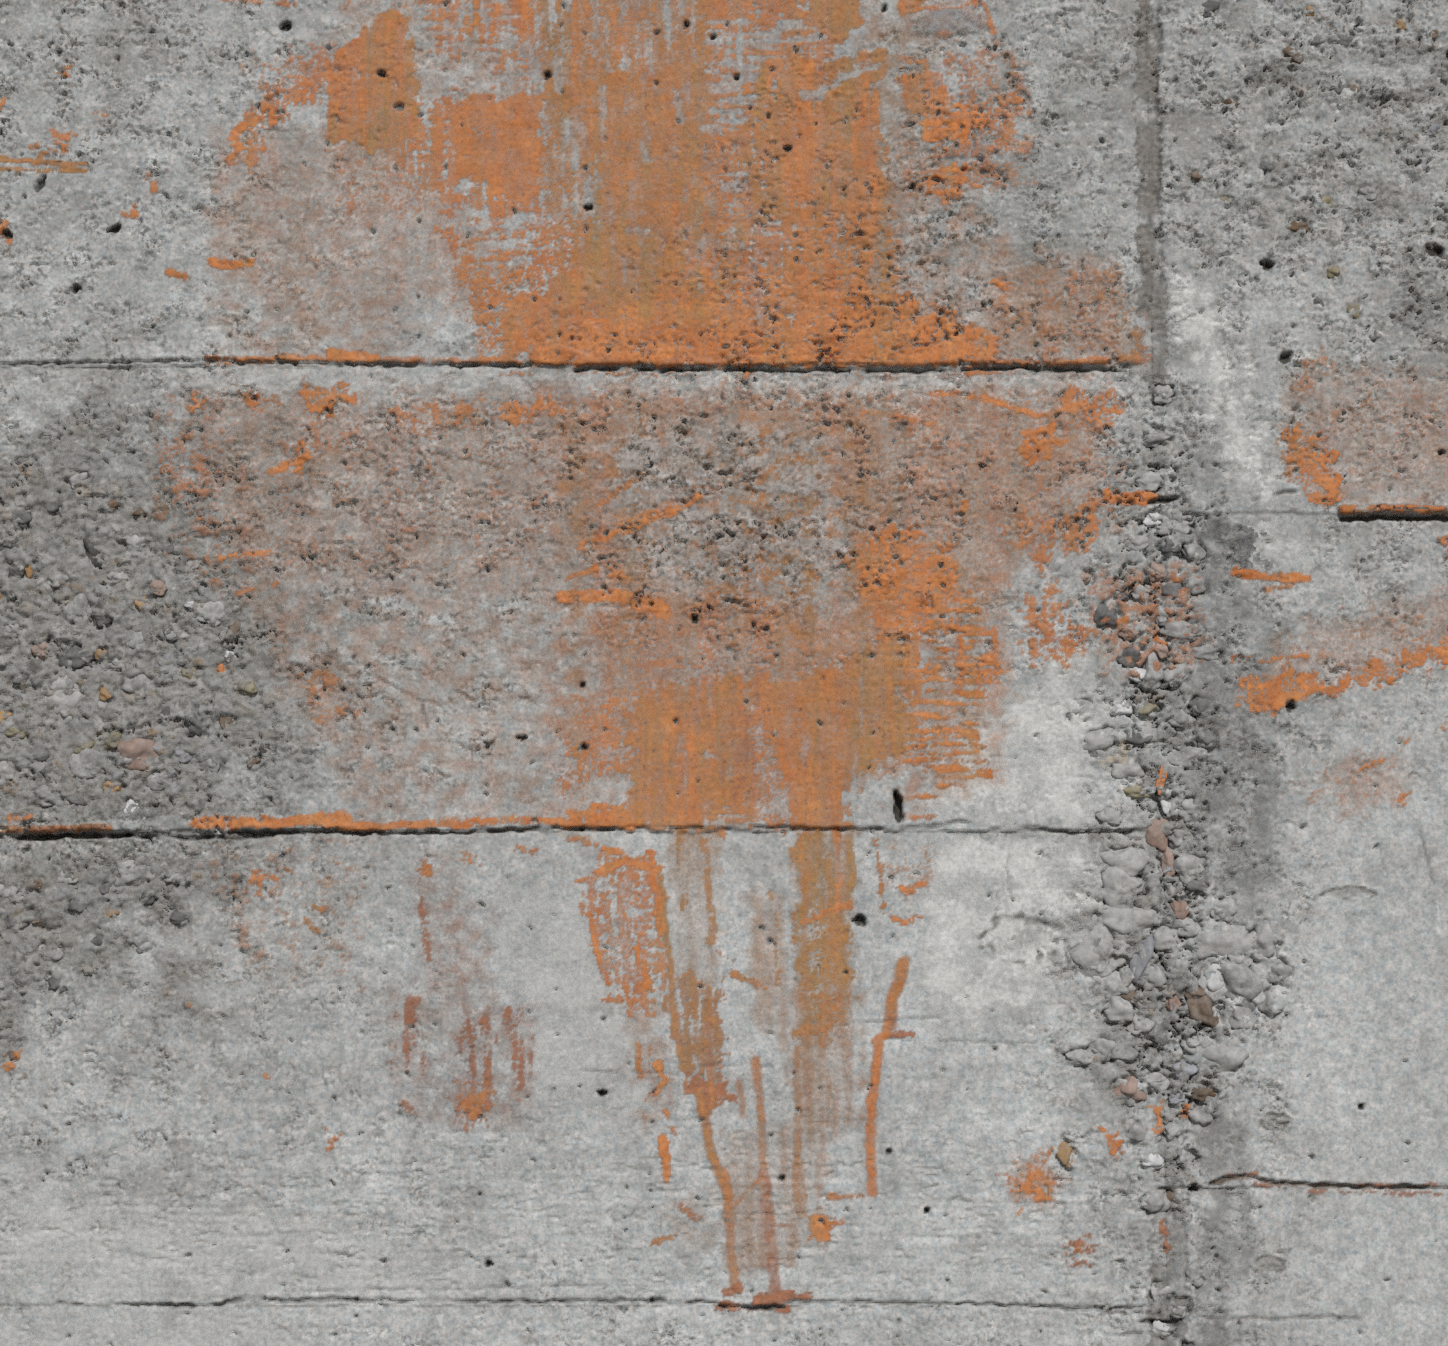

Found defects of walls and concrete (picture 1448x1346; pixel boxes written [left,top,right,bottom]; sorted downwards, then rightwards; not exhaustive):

corrosion [0,151,88,173]
corrosion [417,859,433,877]
corrosion [419,896,431,961]
corrosion [3,1049,22,1071]
corrosion [394,996,426,1071]
corrosion [454,1006,533,1131]